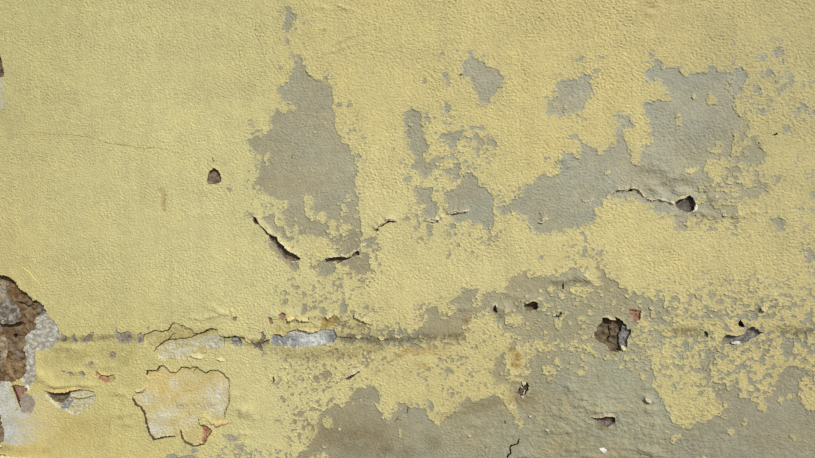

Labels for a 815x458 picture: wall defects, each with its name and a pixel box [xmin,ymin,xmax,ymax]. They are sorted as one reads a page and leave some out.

crack [252,215,300,261]
crack [325,251,360,264]
crack [374,219,397,232]
peeling [201,4,815,458]
spalling [114,323,232,458]